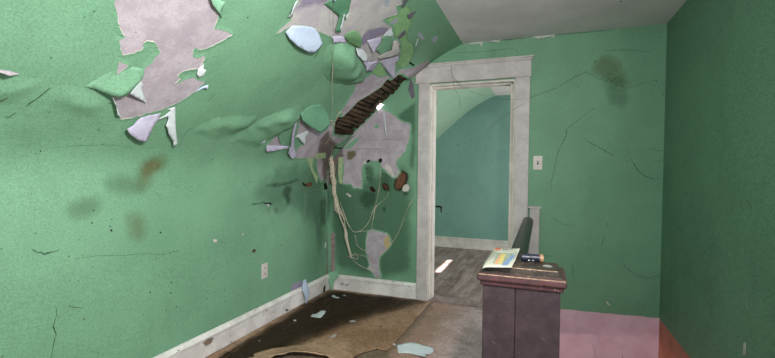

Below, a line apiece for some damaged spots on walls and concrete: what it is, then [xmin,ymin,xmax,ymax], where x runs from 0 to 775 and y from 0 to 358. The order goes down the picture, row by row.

flaking render [114,0,231,119]
flaking render [267,0,431,197]
flaking render [364,228,392,279]
leakage [225,283,421,358]